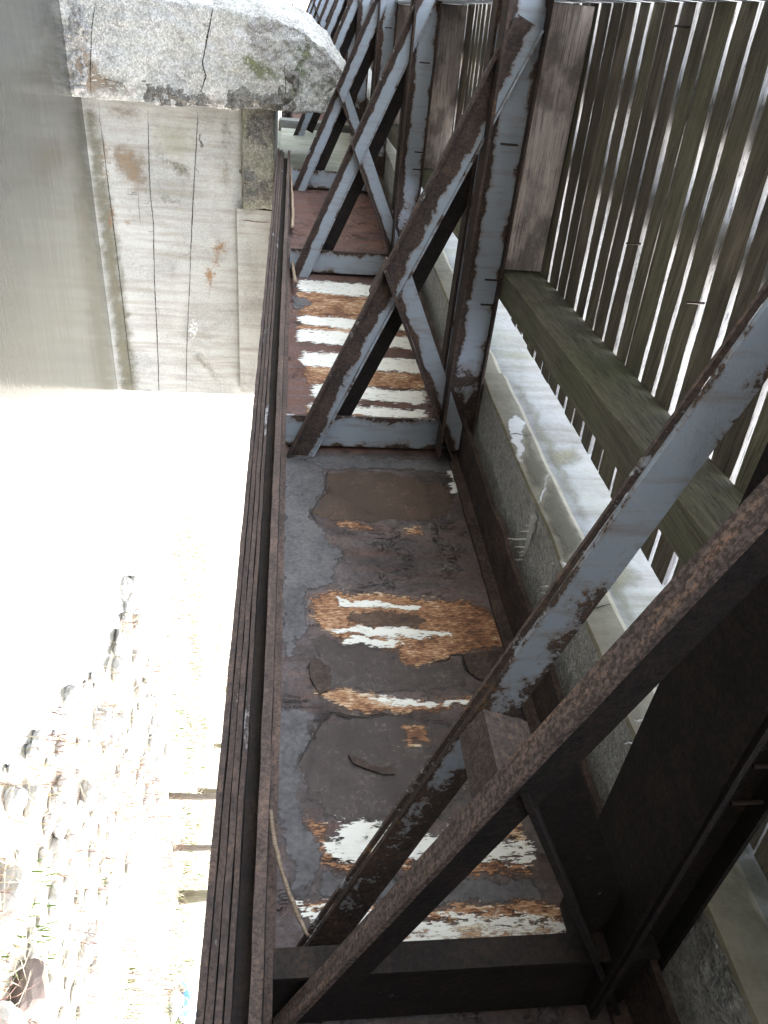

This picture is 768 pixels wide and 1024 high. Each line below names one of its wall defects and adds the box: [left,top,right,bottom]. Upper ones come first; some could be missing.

crack [201,2,215,90]
crack [99,114,199,396]
peeling [297,279,370,297]
peeling [294,315,356,370]
peeling [377,324,420,374]
peeling [352,387,431,419]
peeling [331,624,454,648]
corrosion [272,455,508,913]
peeling [322,815,391,865]
corrosion [505,823,527,847]
corrosion [404,858,564,940]
peeling [403,904,566,941]